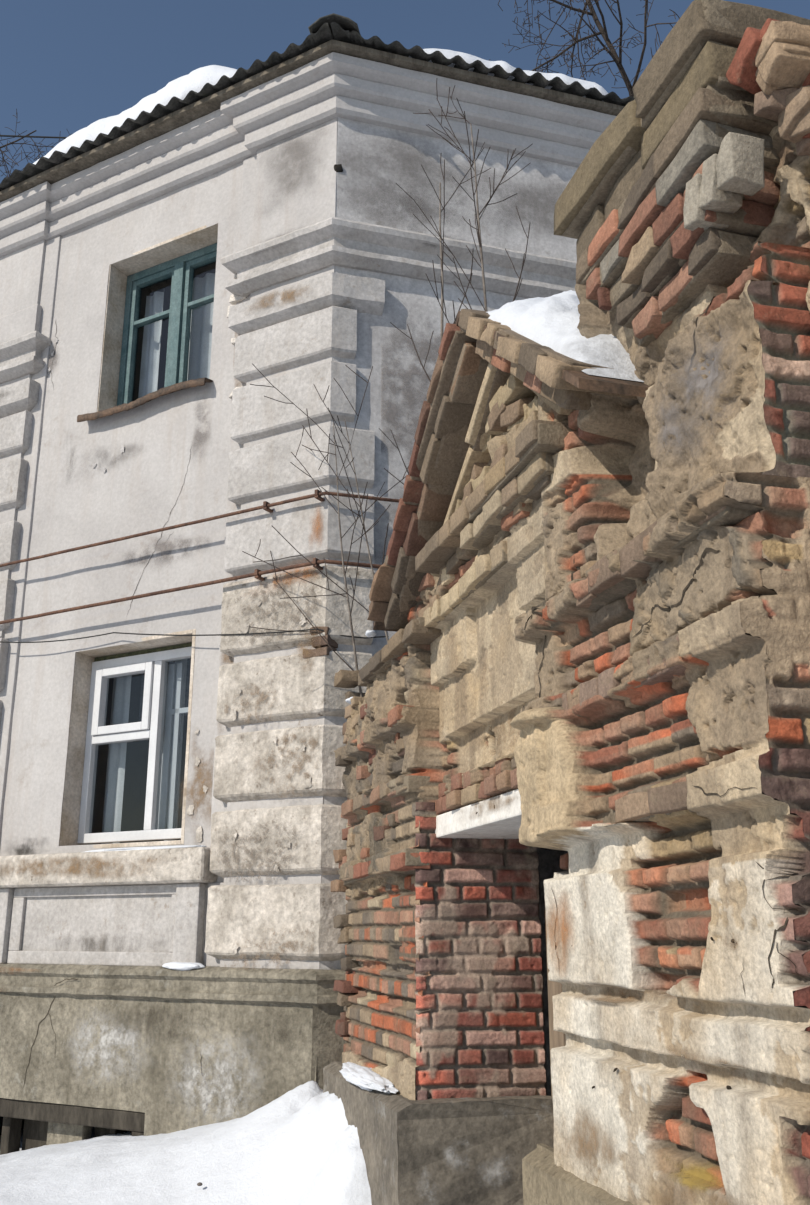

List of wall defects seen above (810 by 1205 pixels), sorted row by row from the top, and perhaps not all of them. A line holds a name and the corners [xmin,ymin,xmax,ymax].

spalling [501,475,551,532]
spalling [418,553,468,617]
crack [633,548,719,637]
spalling [335,750,376,780]
spalling [346,814,399,859]
spalling [765,814,810,988]
crack [23,978,78,1087]
spalling [643,1070,725,1190]